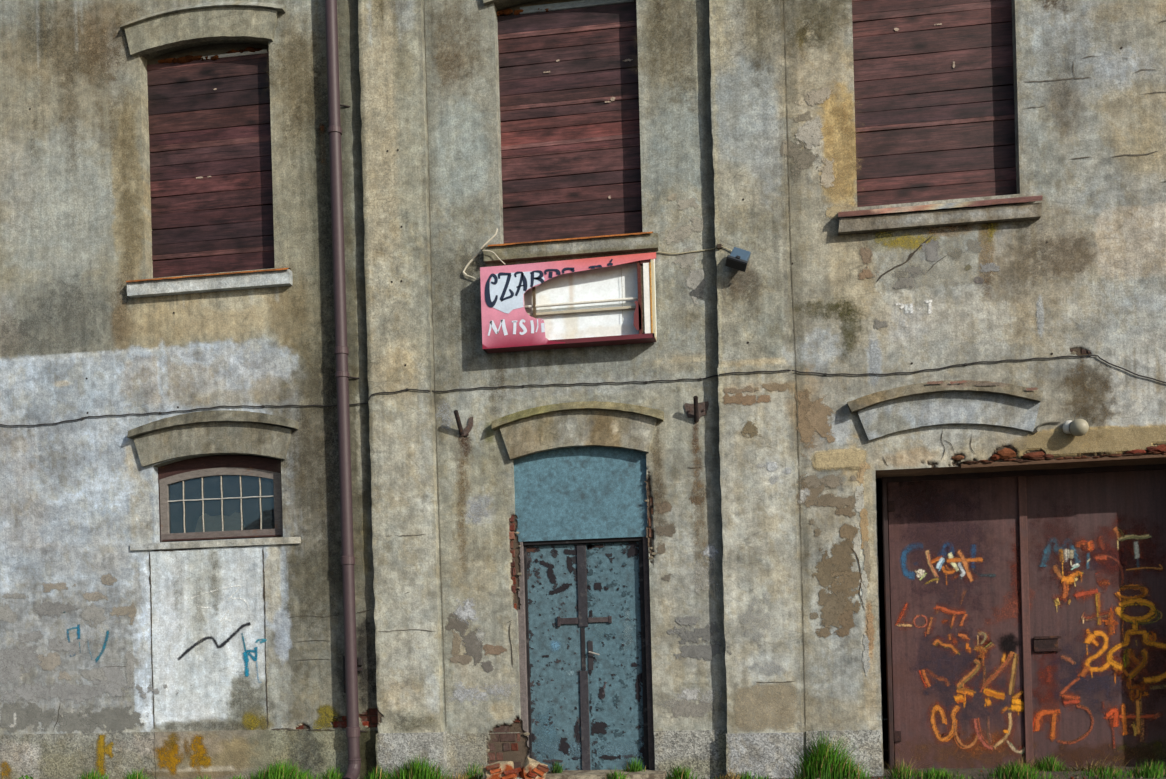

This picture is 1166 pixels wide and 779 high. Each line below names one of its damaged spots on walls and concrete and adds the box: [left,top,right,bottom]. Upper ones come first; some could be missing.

crack [877,235,947,281]
peeling [723,382,875,676]
rust [899,491,1030,622]
rust [1034,516,1165,587]
peeling [0,574,179,736]
flaking render [332,708,383,730]
peeling [446,613,507,673]
flaking render [486,471,676,777]
peeling [667,616,732,661]
rust [914,625,1024,755]
rust [1055,637,1121,703]